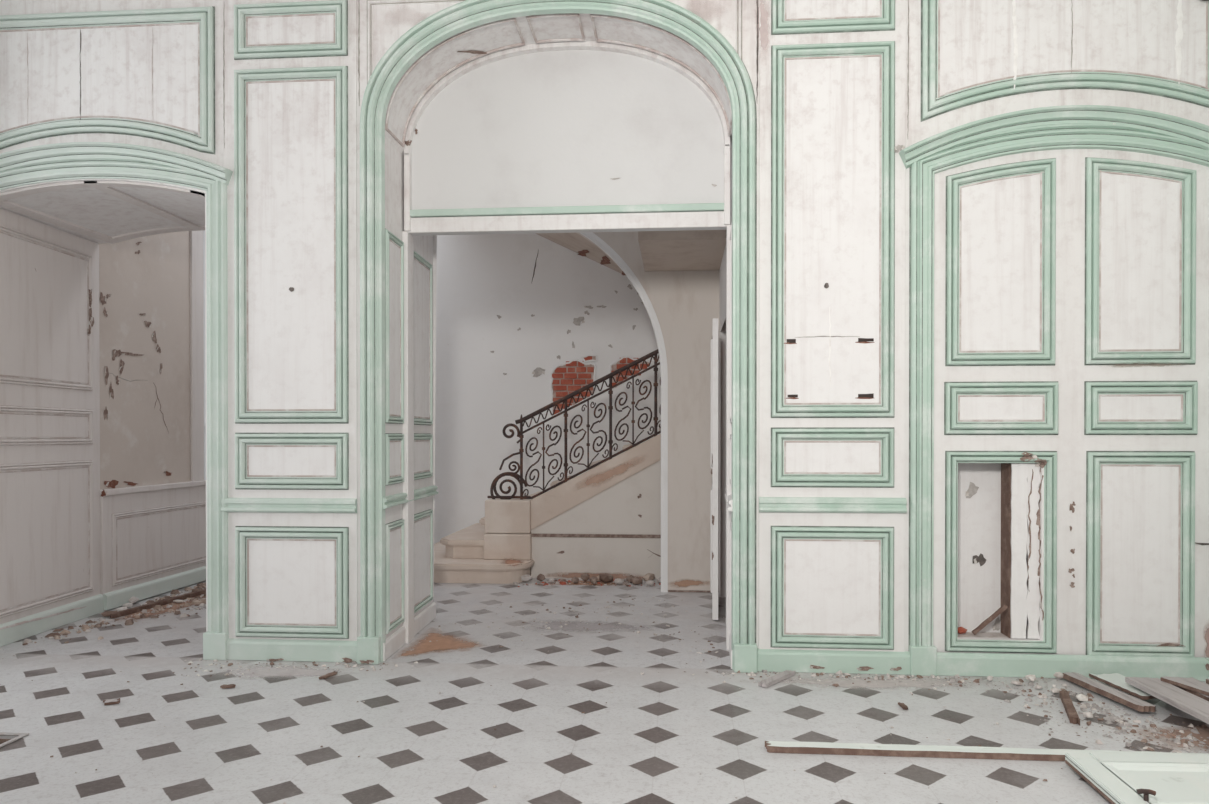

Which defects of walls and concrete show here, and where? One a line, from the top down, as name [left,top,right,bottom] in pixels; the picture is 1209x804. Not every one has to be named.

peeling [577,250,644,330]
peeling [104,349,142,420]
peeling [139,313,163,374]
flaking render [532,305,654,417]
peeling [101,480,137,497]